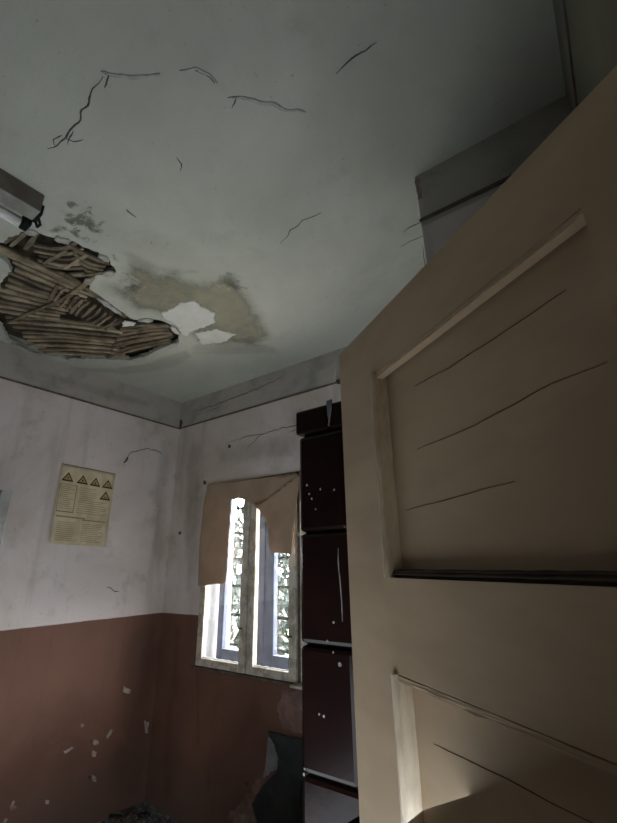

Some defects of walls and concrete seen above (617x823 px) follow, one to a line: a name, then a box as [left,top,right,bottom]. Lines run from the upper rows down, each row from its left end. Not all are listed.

crack [336,42,377,74]
crack [47,66,306,149]
spalling [0,229,236,362]
peeling [226,737,278,823]